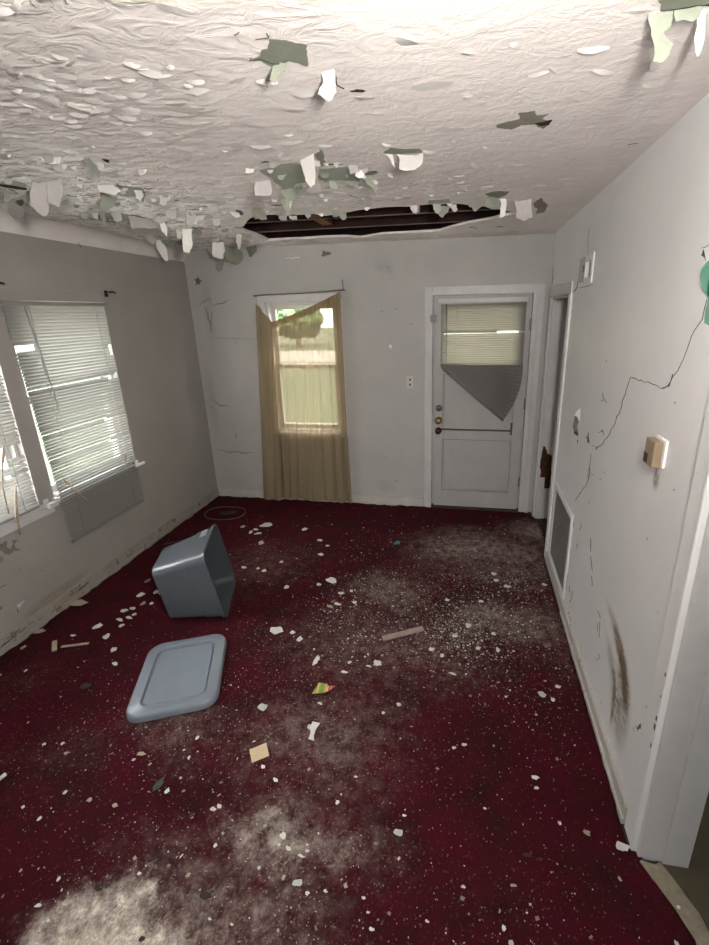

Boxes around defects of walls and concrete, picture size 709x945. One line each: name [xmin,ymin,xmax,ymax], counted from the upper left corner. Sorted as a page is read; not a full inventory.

flaking render [0,0,57,34]
flaking render [157,3,190,14]
flaking render [577,46,610,54]
peeling [629,0,709,72]
flaking render [0,33,574,272]
peeling [700,245,709,325]
crack [575,299,707,501]
leakage [611,627,628,715]